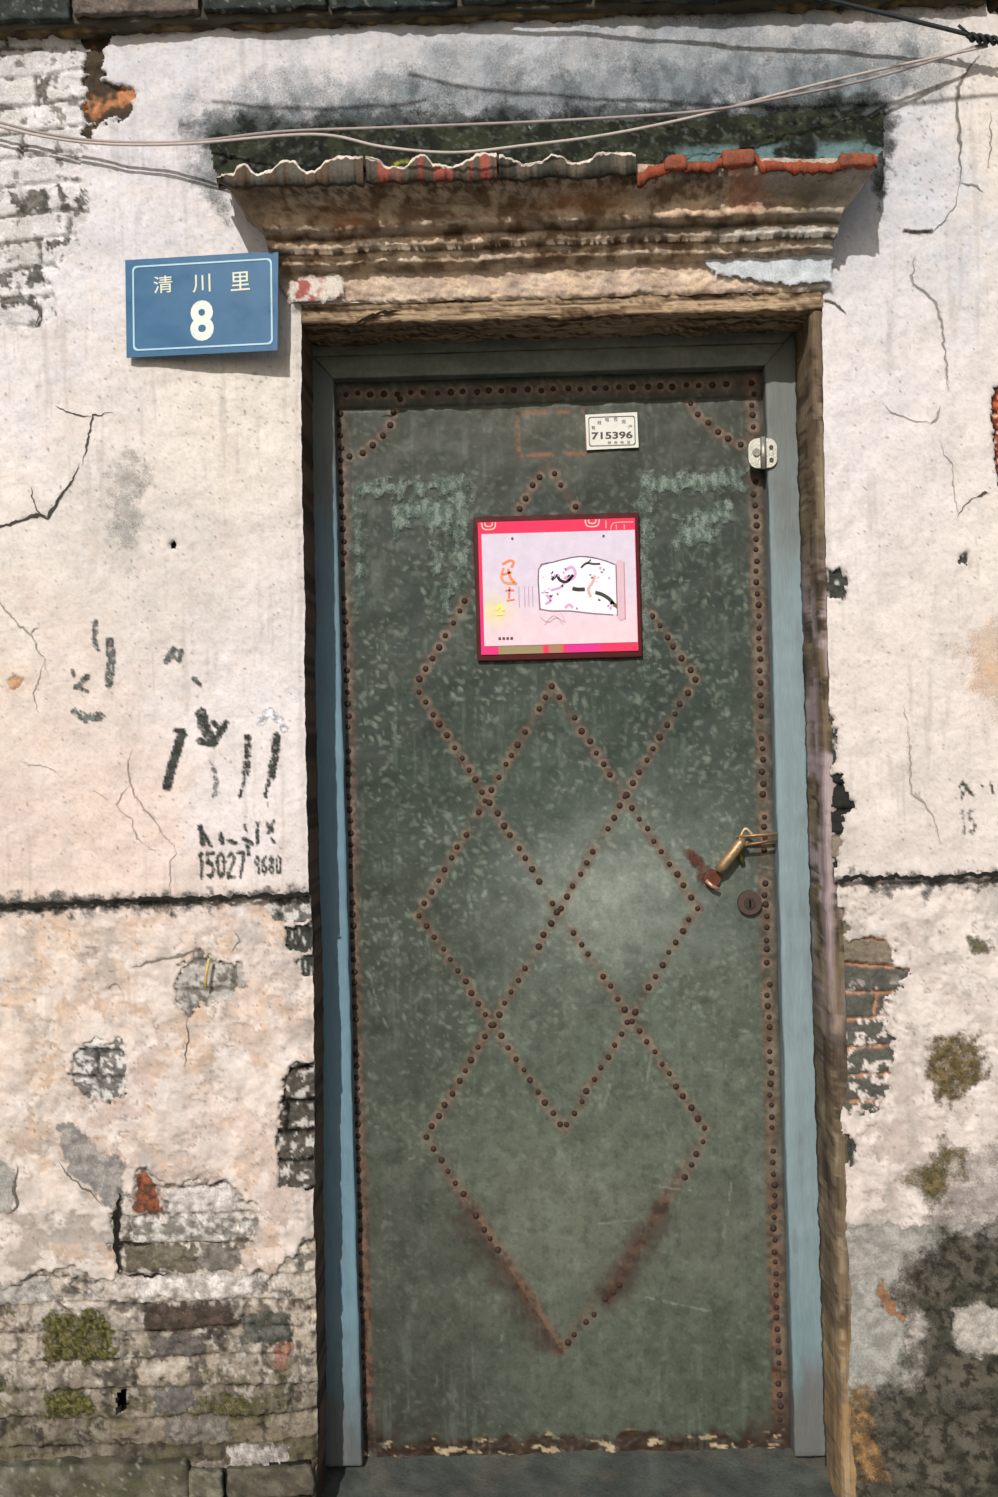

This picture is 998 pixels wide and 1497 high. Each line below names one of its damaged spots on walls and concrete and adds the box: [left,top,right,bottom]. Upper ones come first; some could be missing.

flaking render [0,37,136,334]
damp [178,5,977,224]
crack [883,56,992,515]
crack [0,405,113,527]
spalling [990,387,998,486]
crack [0,603,48,712]
crack [834,706,998,899]
flaking render [68,1036,127,1105]
peeling [275,1061,315,1191]
flaking render [841,907,911,1116]
flaking render [0,1122,318,1466]
damp [850,1145,998,1497]